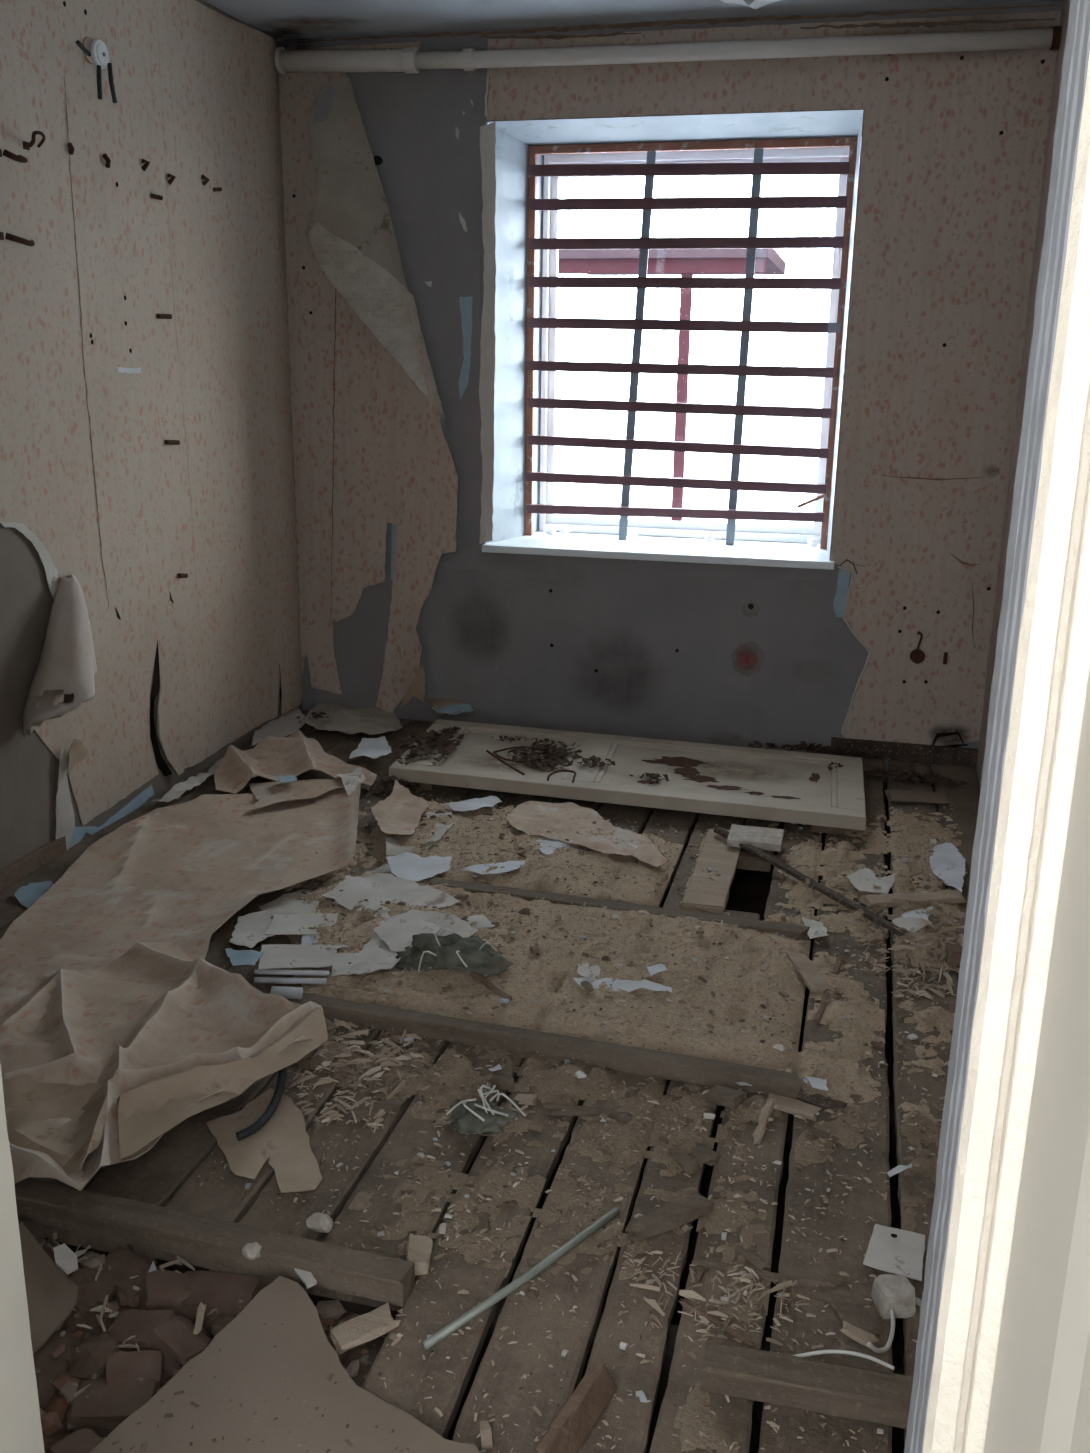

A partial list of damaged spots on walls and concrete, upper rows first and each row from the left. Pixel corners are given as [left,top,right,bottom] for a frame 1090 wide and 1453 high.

flaking render [347,44,869,747]
flaking render [0,523,85,869]
peeling [637,756,802,799]